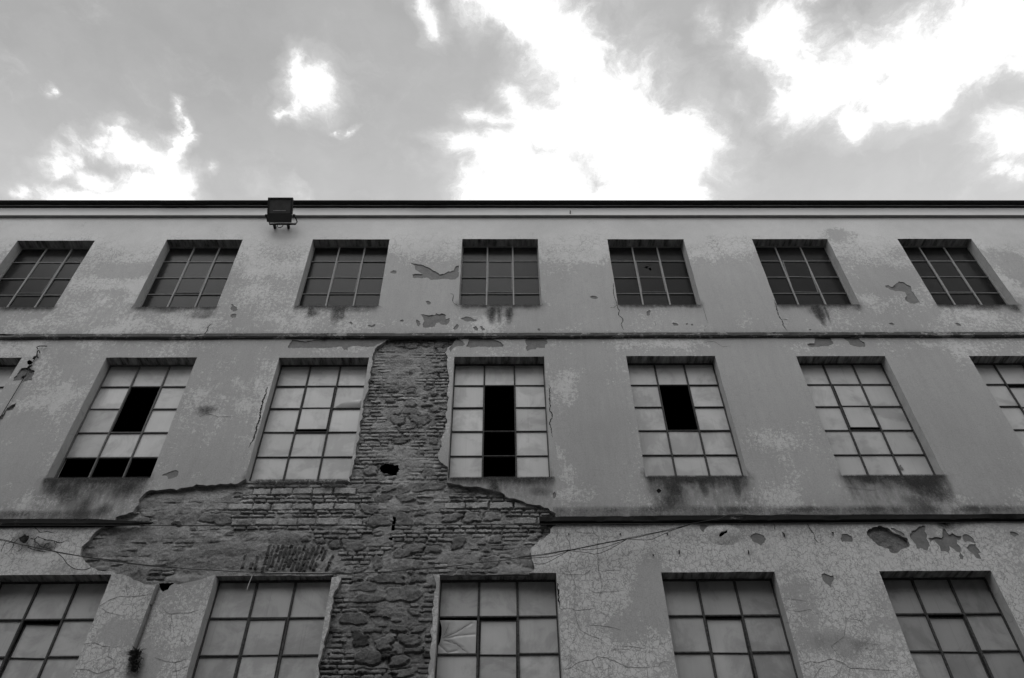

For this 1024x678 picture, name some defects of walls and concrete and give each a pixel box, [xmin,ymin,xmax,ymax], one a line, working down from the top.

peeling [412,263,459,280]
peeling [885,281,919,304]
spalling [14,367,35,381]
crack [250,387,268,445]
water stain [1,477,148,518]
spalling [82,301,555,678]
water stain [556,474,949,528]
spalling [867,524,981,559]
crack [556,529,667,678]